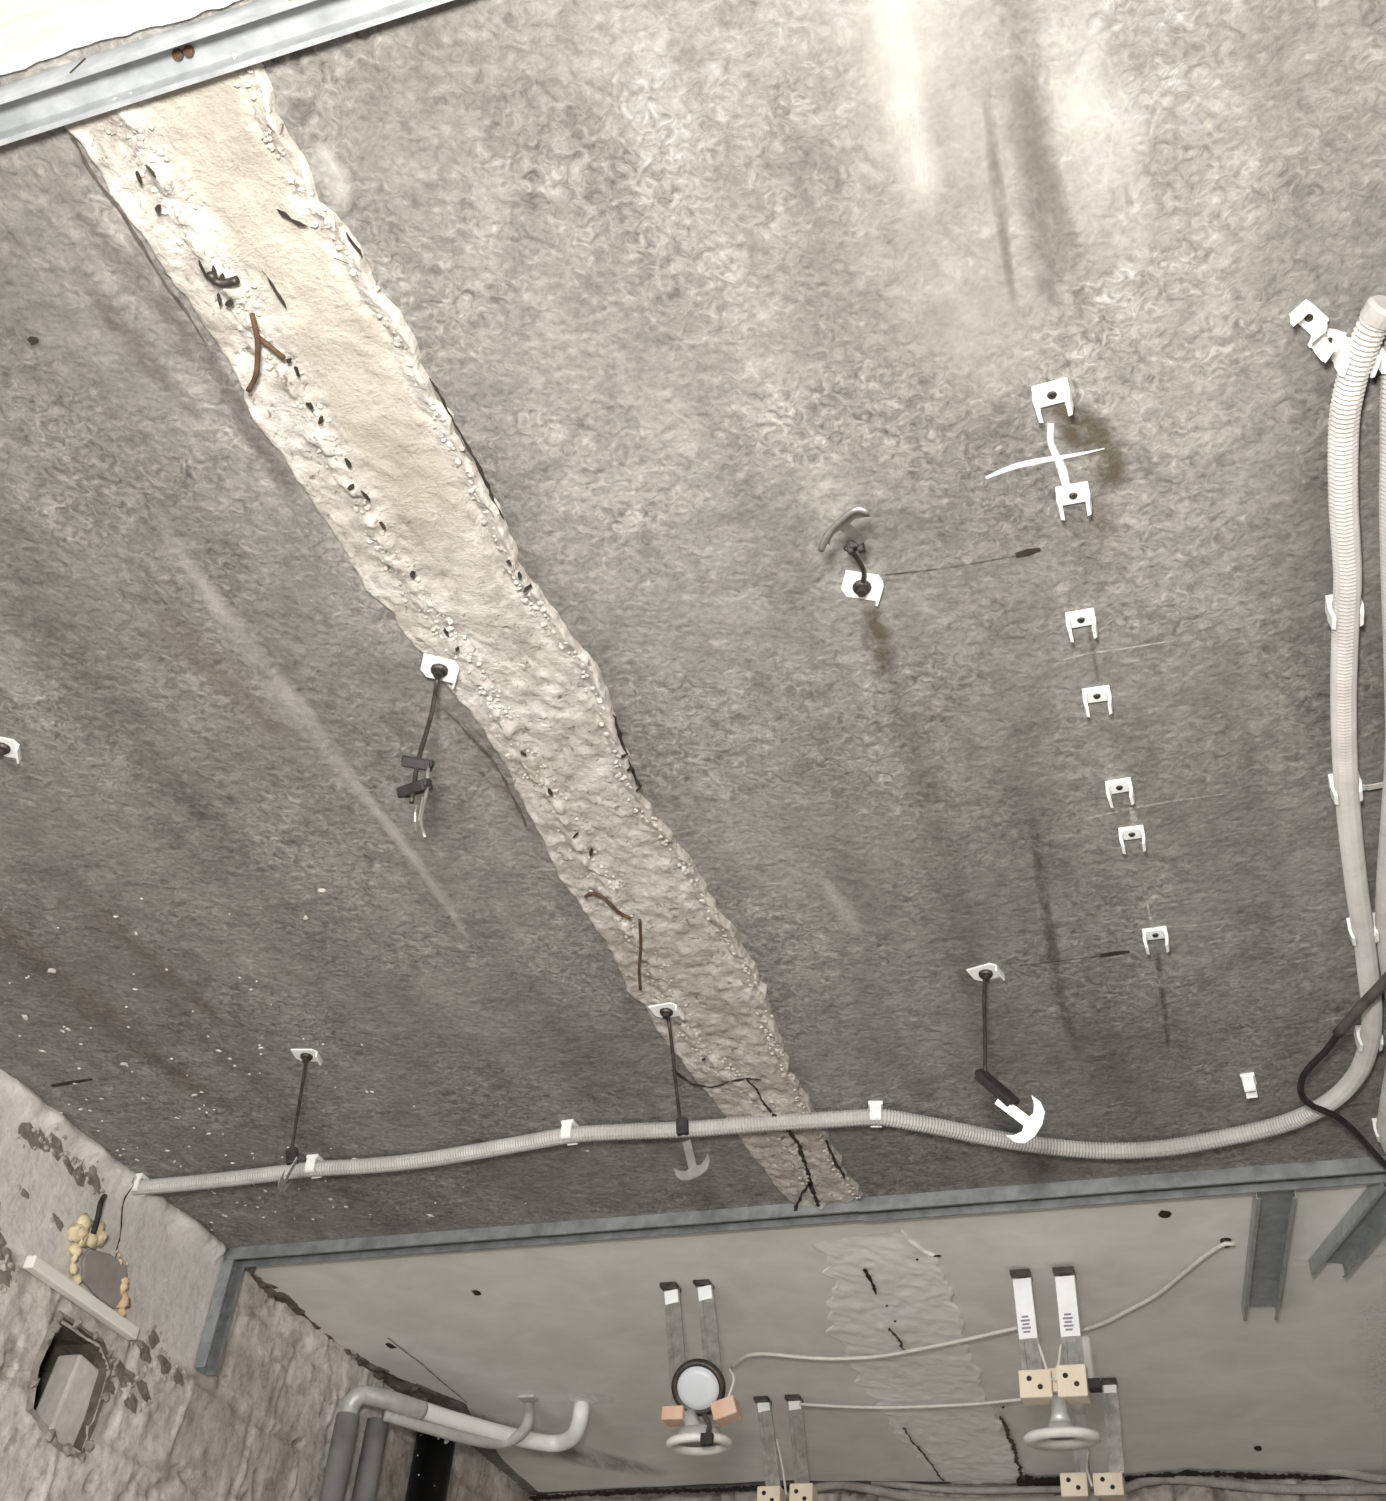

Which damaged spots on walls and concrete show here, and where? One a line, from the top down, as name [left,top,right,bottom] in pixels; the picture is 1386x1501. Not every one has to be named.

spalling [135,164,156,185]
spalling [198,260,234,307]
damp [1055,405,1123,482]
spalling [345,458,370,501]
damp [867,610,888,663]
peeling [376,314,861,1199]
spalling [16,1122,105,1195]
crack [671,1070,845,1211]
crack [863,1268,877,1294]
crack [888,1328,905,1350]
spalling [26,1310,187,1465]
crack [903,1427,944,1481]